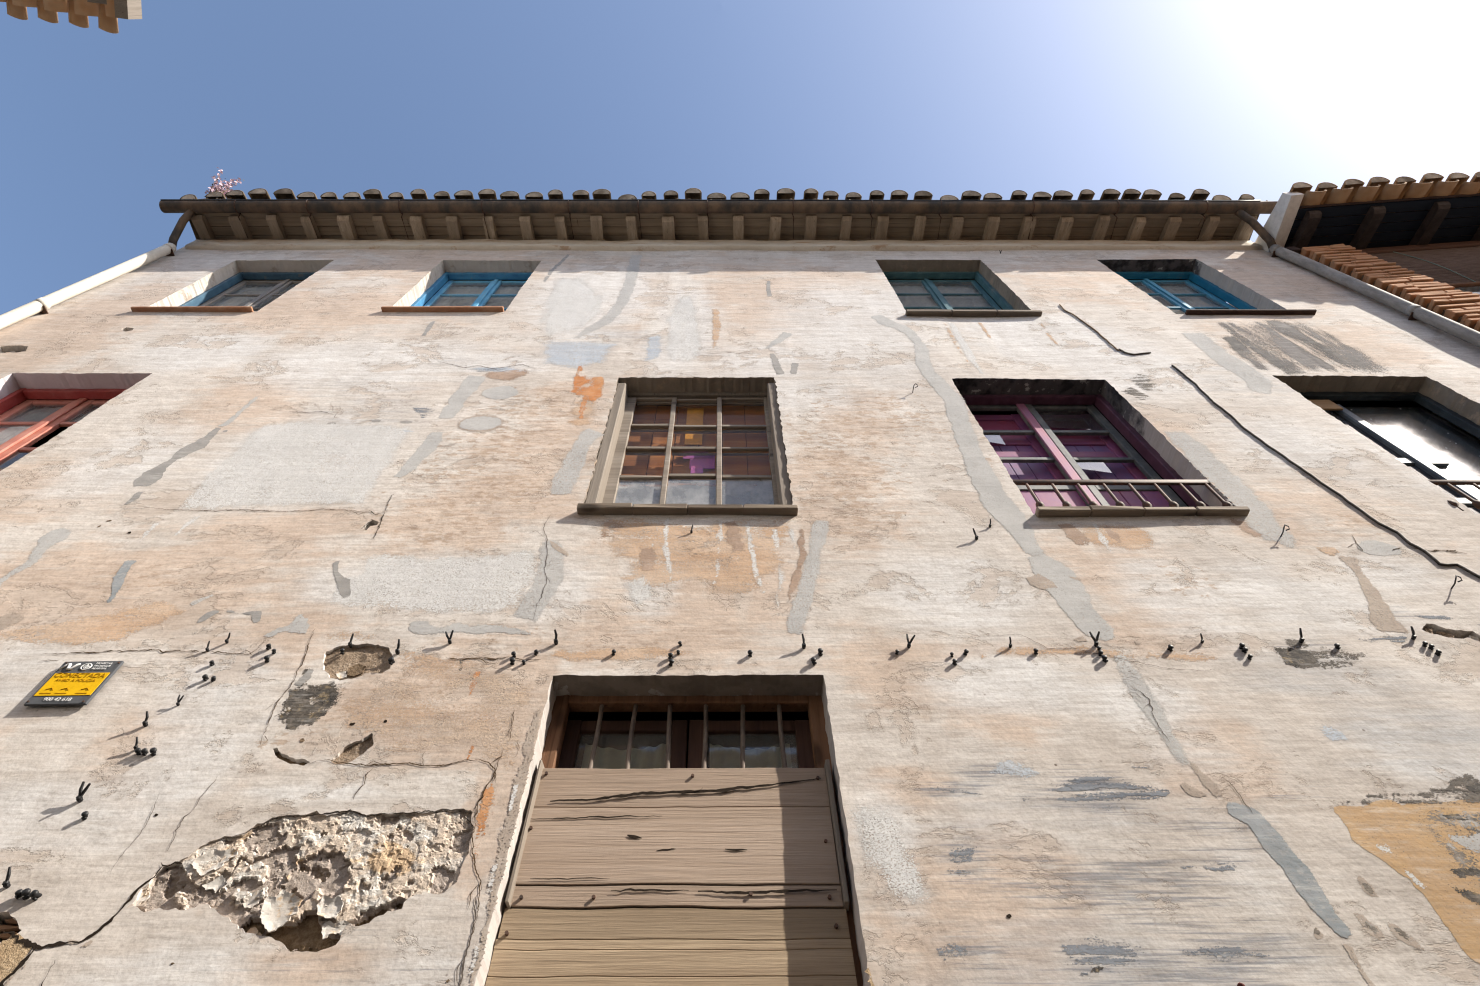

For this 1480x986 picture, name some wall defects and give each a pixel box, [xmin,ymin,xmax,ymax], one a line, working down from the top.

rust [568,366,605,426]
water stain [1217,320,1349,374]
water stain [1274,636,1407,669]
crack [9,712,519,986]
spalling [133,809,473,952]
peeling [1333,774,1480,964]